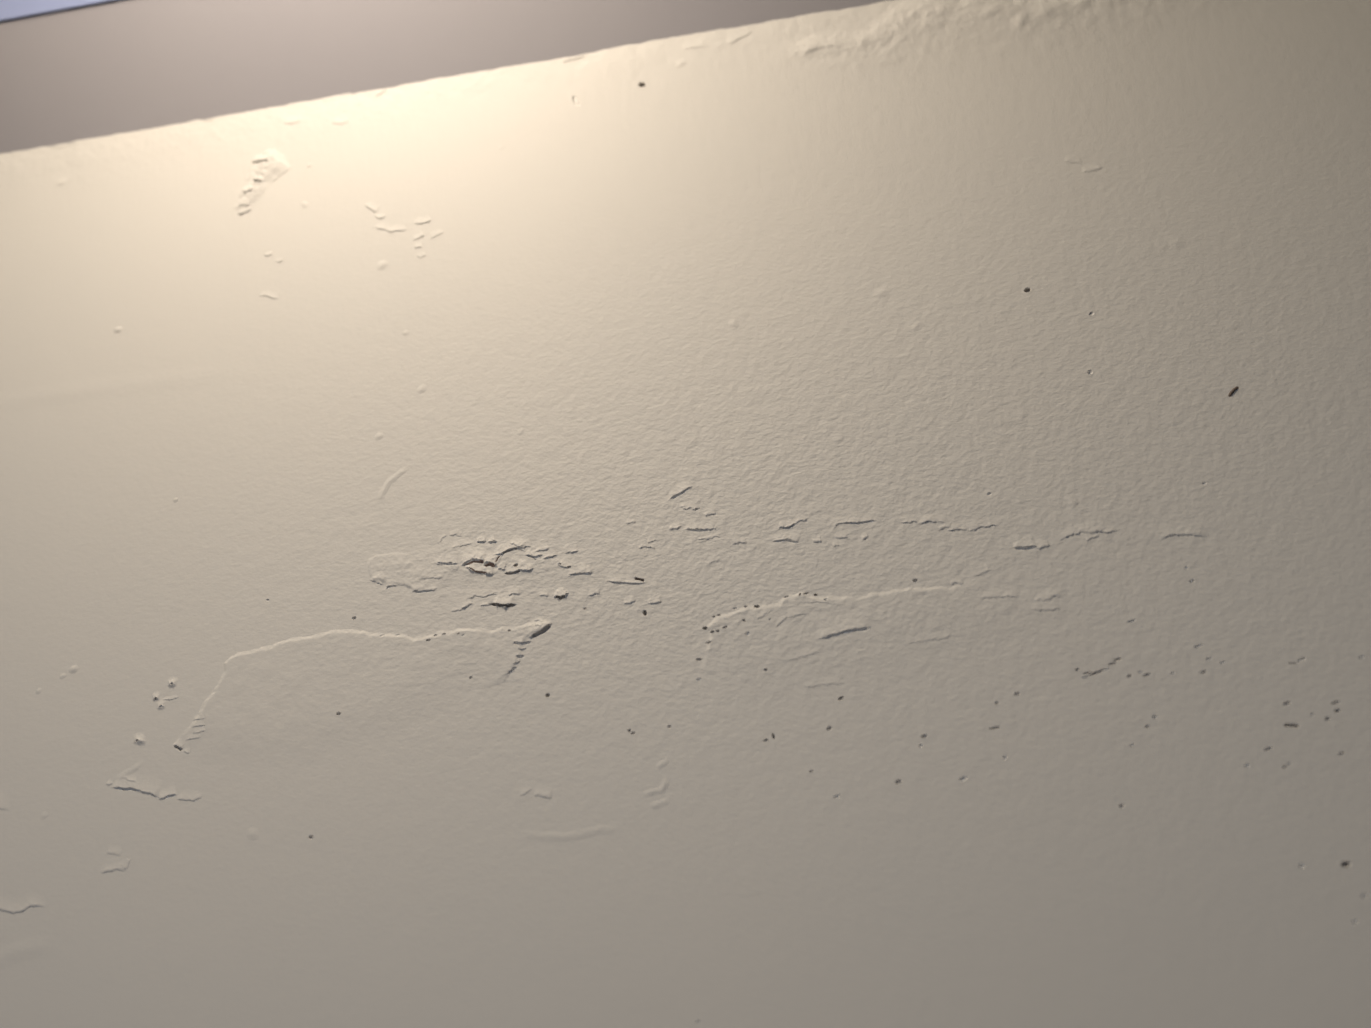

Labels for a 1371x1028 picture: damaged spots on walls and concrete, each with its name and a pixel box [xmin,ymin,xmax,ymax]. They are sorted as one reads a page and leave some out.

spalling [232,153,287,216]
peeling [367,526,662,632]